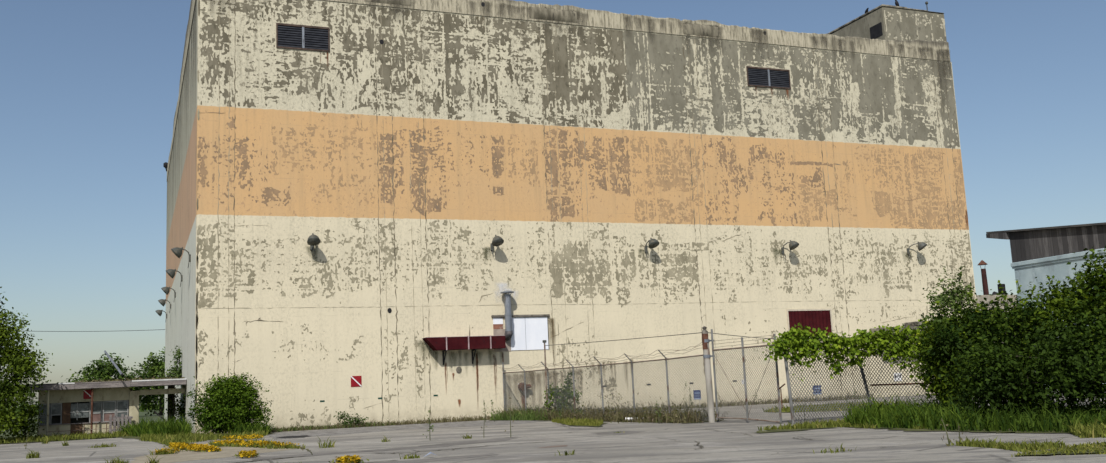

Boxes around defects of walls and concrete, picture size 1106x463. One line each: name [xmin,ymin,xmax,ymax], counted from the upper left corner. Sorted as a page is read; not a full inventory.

peeling [195,0,976,406]
peeling [290,400,331,427]